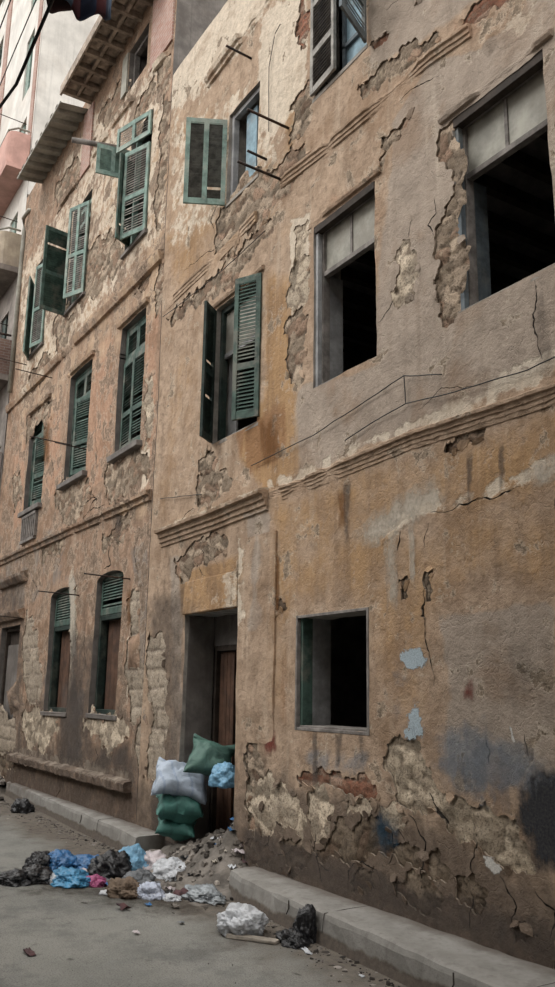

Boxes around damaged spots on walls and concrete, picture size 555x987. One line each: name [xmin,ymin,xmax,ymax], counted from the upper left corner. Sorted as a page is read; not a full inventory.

spalling [458,0,509,25]
spalling [357,30,441,99]
spalling [171,76,325,327]
spalling [432,122,471,328]
spalling [139,258,165,318]
spalling [285,220,311,387]
spalling [391,239,420,309]
spalling [196,444,233,511]
spalling [175,531,229,584]
peeling [399,647,428,670]
spalling [242,705,536,916]
water stain [517,771,555,870]